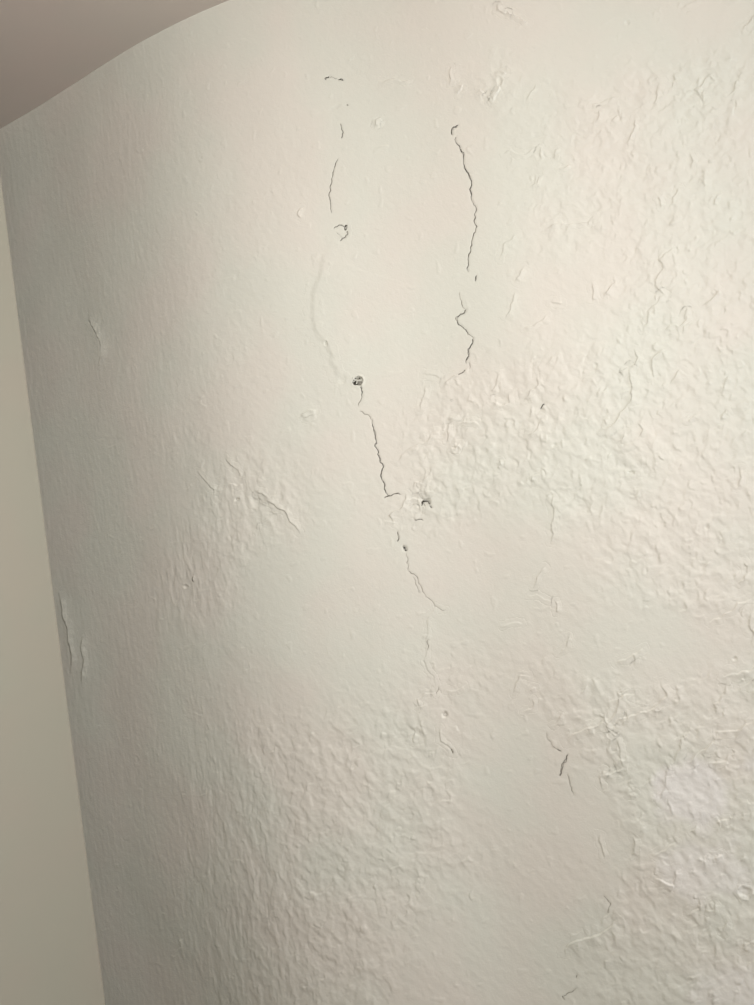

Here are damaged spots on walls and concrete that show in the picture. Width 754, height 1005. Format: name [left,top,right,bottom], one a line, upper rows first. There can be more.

crack [329,127,348,241]
crack [451,125,477,375]
crack [358,385,432,520]